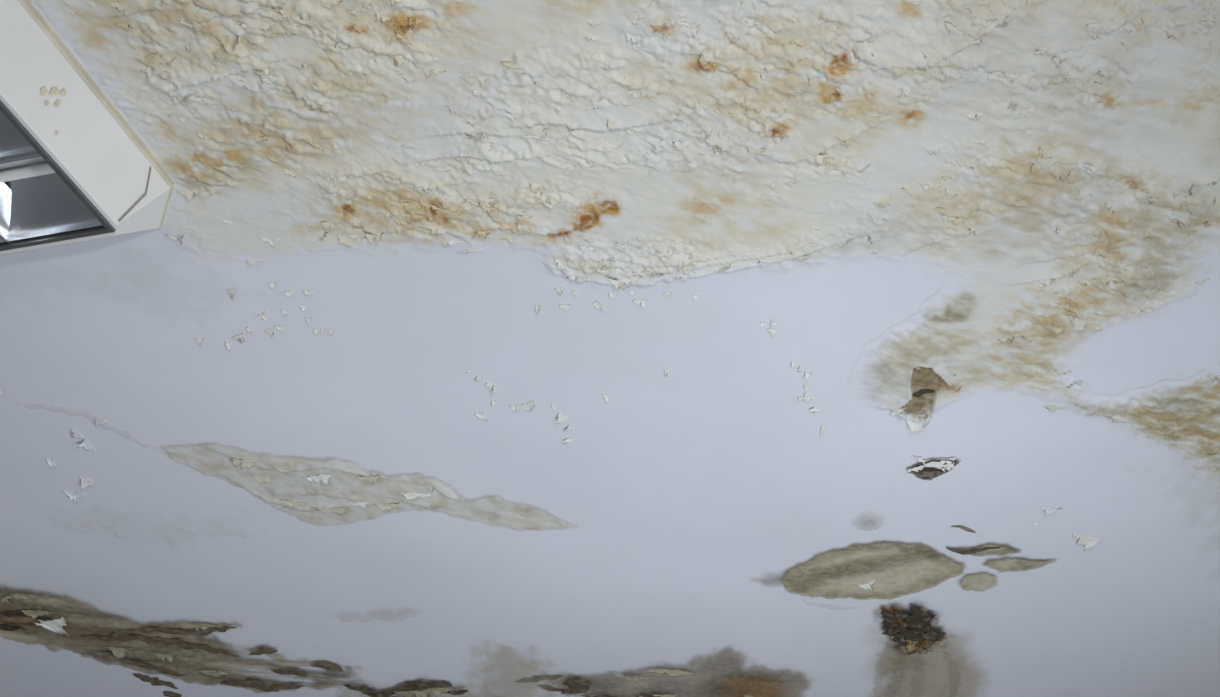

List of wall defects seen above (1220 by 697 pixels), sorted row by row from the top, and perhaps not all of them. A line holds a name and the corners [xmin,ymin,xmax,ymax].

rust [642,14,696,38]
rust [677,53,725,82]
rust [810,47,863,113]
rust [750,115,802,146]
rust [891,105,929,131]
rust [538,196,626,248]
peeling [31,0,1220,505]
peeling [163,444,573,531]
spalling [781,542,1055,600]
spalling [0,589,468,697]
leakage [881,606,946,675]
spalling [515,651,808,697]